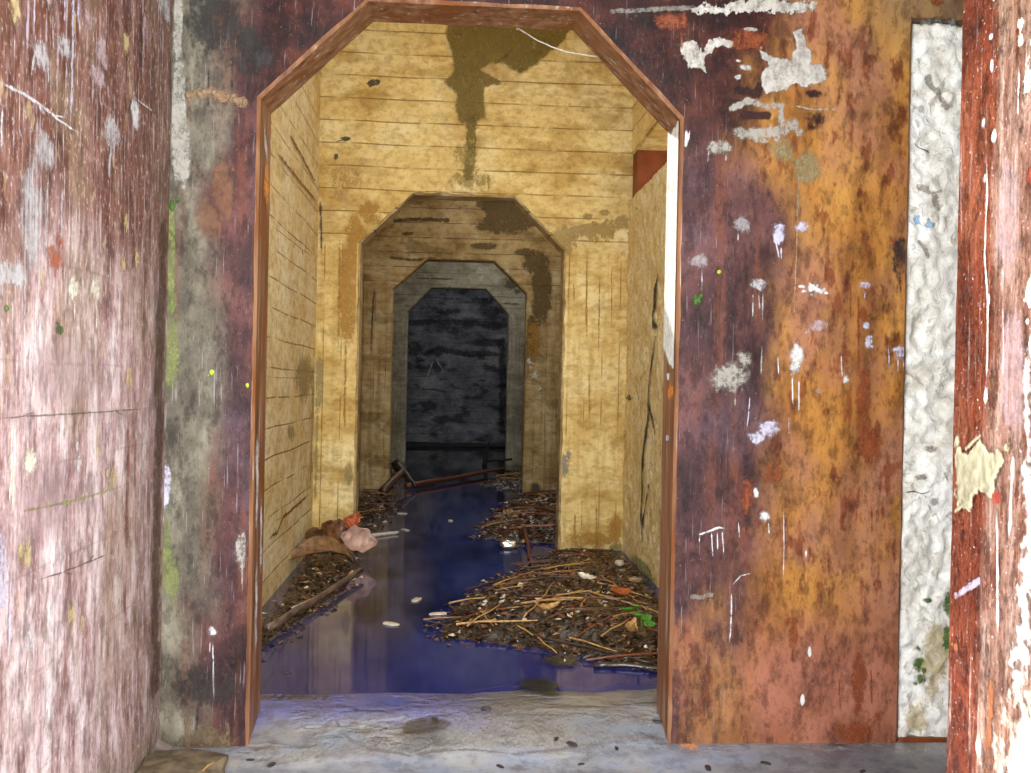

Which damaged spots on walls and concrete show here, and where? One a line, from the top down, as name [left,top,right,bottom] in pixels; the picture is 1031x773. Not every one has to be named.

rust [656,14,686,48]
peeling [680,37,733,72]
peeling [690,0,818,16]
peeling [735,28,827,94]
leakage [445,25,570,188]
rust [724,83,772,120]
rust [807,112,825,130]
leakage [470,201,534,250]
leakage [337,202,380,423]
leakage [408,248,552,435]
crack [640,275,658,534]
peeling [944,435,1009,513]